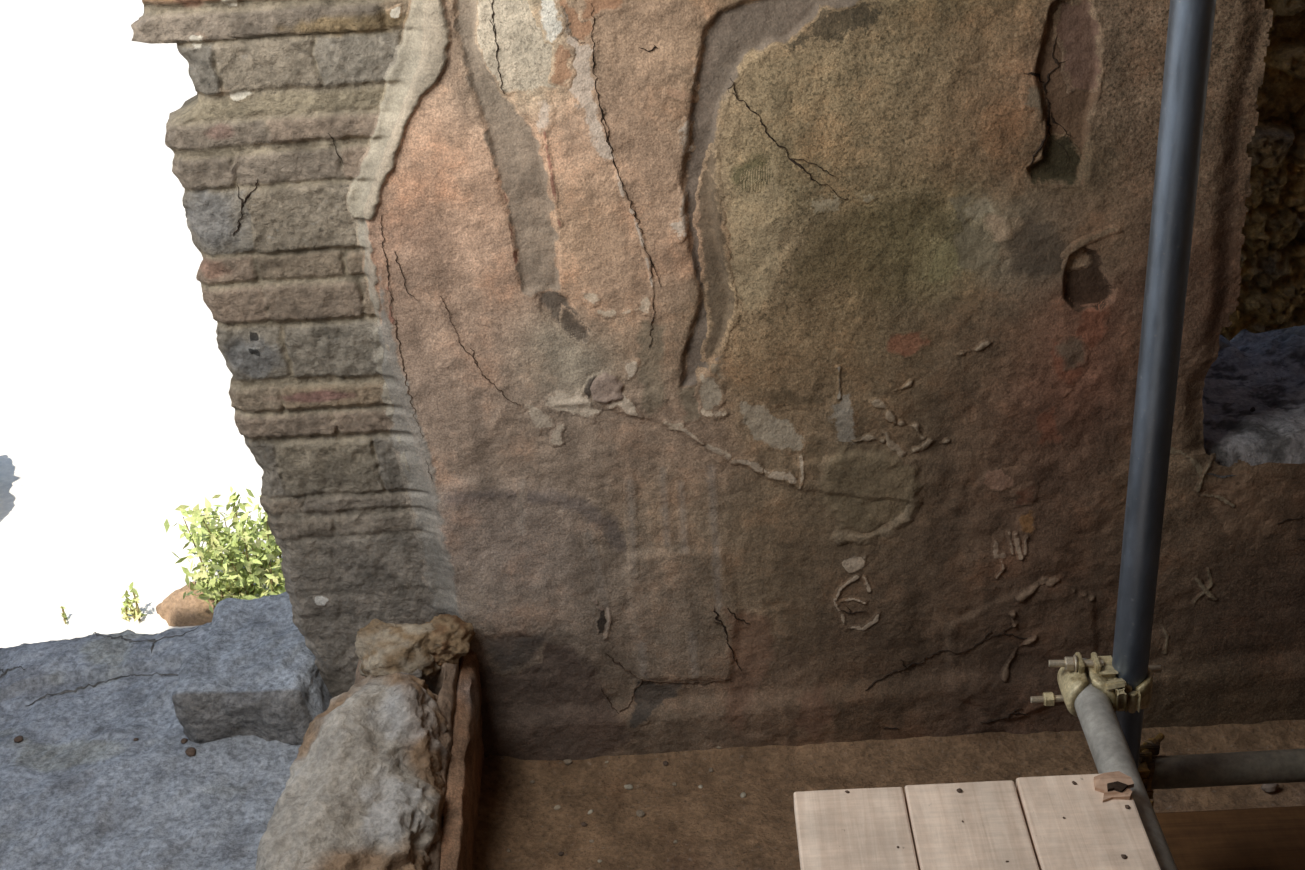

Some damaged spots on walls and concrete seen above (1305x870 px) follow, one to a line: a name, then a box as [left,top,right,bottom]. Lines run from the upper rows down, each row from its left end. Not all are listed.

crack [233,181,258,237]
flaking render [449,0,655,346]
crack [591,4,660,346]
flaking render [660,0,905,389]
crack [728,78,848,199]
spalling [1018,0,1105,190]
spalling [1060,224,1124,314]
crack [380,215,520,479]
peeling [523,357,645,448]
peeling [831,553,882,631]
crack [26,626,199,706]
crack [601,608,749,714]